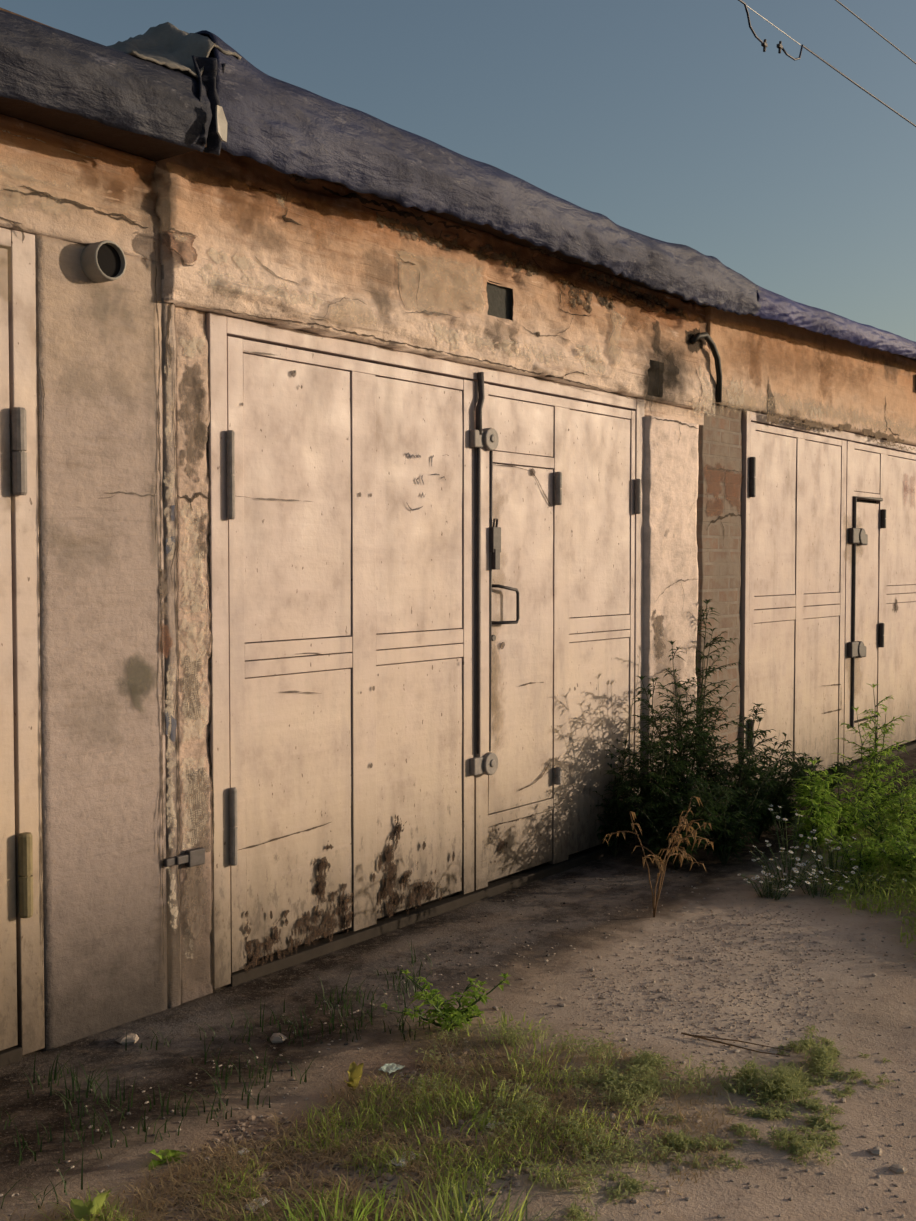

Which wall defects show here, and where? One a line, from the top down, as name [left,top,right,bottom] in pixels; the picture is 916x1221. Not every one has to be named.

crack [260,188,301,225]
crack [322,186,476,234]
crack [204,307,698,445]
damp [645,322,679,407]
spalling [704,463,742,517]
crack [0,185,214,987]
peeling [159,335,211,852]
damp [126,659,153,710]
peeling [166,867,193,959]
rust [239,822,331,850]
rust [239,843,354,973]
rust [371,814,442,918]